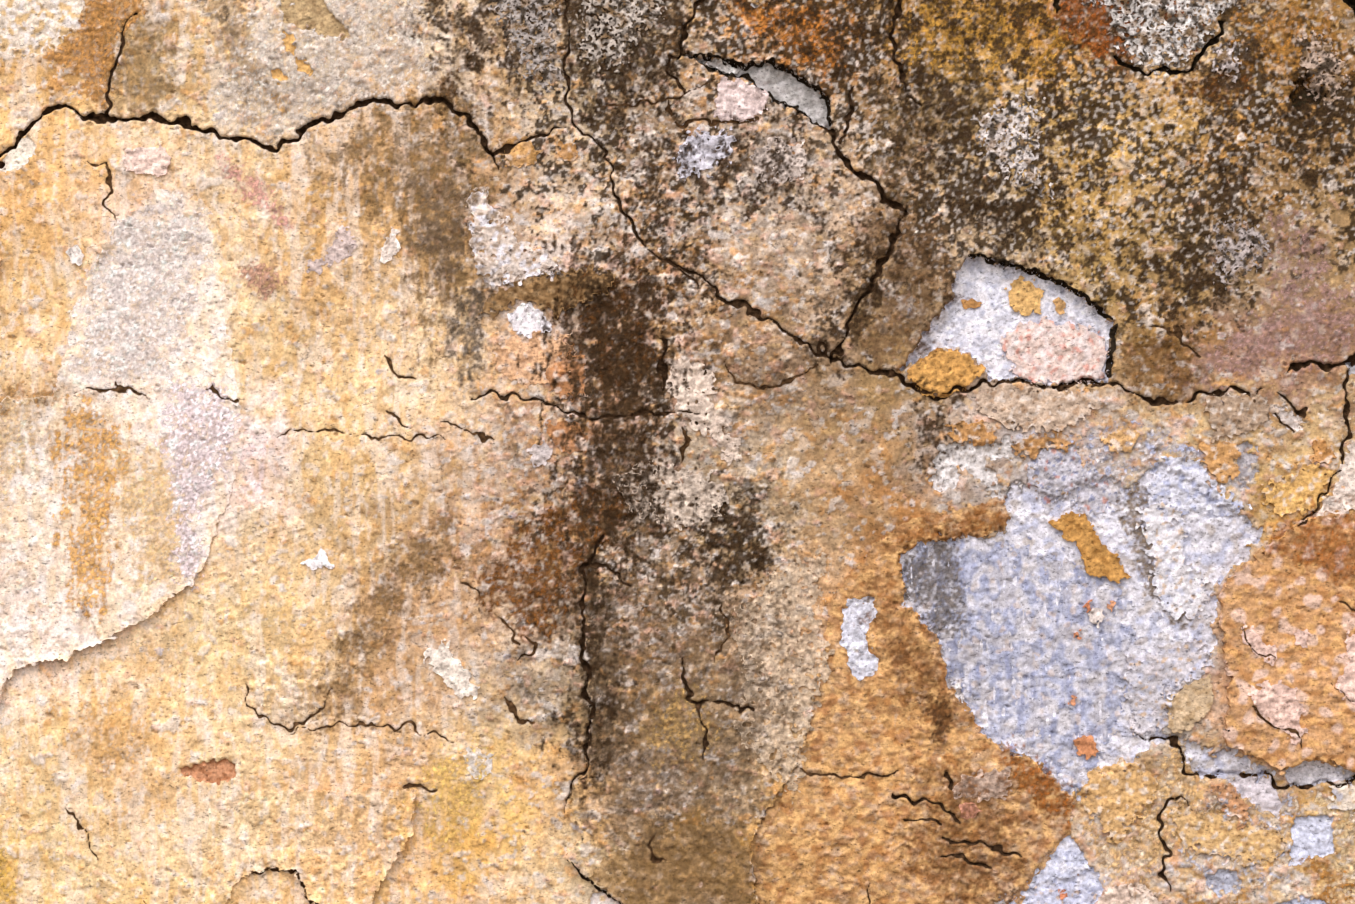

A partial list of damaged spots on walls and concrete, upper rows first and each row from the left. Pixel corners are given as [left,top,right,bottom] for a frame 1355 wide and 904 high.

peeling [0,144,245,703]
leakage [316,259,798,868]
crack [564,535,631,812]
spalling [590,889,620,904]
crack [0,0,1355,526]
spalling [900,253,1118,398]
peeling [750,435,1355,904]